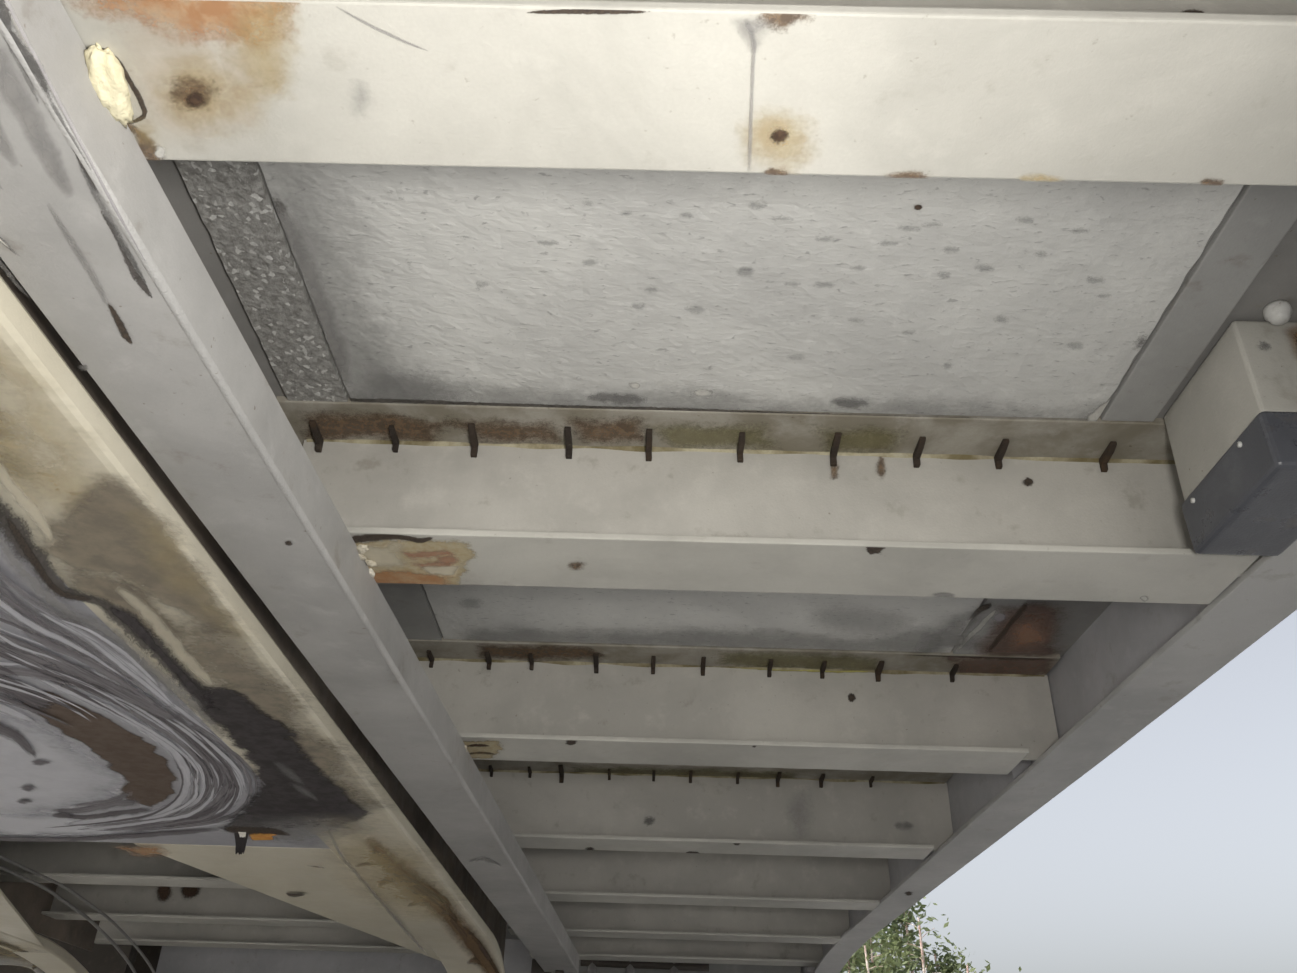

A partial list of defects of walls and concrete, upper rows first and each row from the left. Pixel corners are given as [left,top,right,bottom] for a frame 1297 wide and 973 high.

rust [97,0,284,45]
rust [172,79,213,107]
crack [744,24,759,157]
peeling [0,0,152,298]
rust [771,130,788,142]
rust [305,411,557,443]
rust [572,418,644,444]
rust [659,427,768,447]
peeling [352,534,475,585]
water stain [0,378,374,842]
rust [480,645,605,660]
rust [916,605,1057,675]